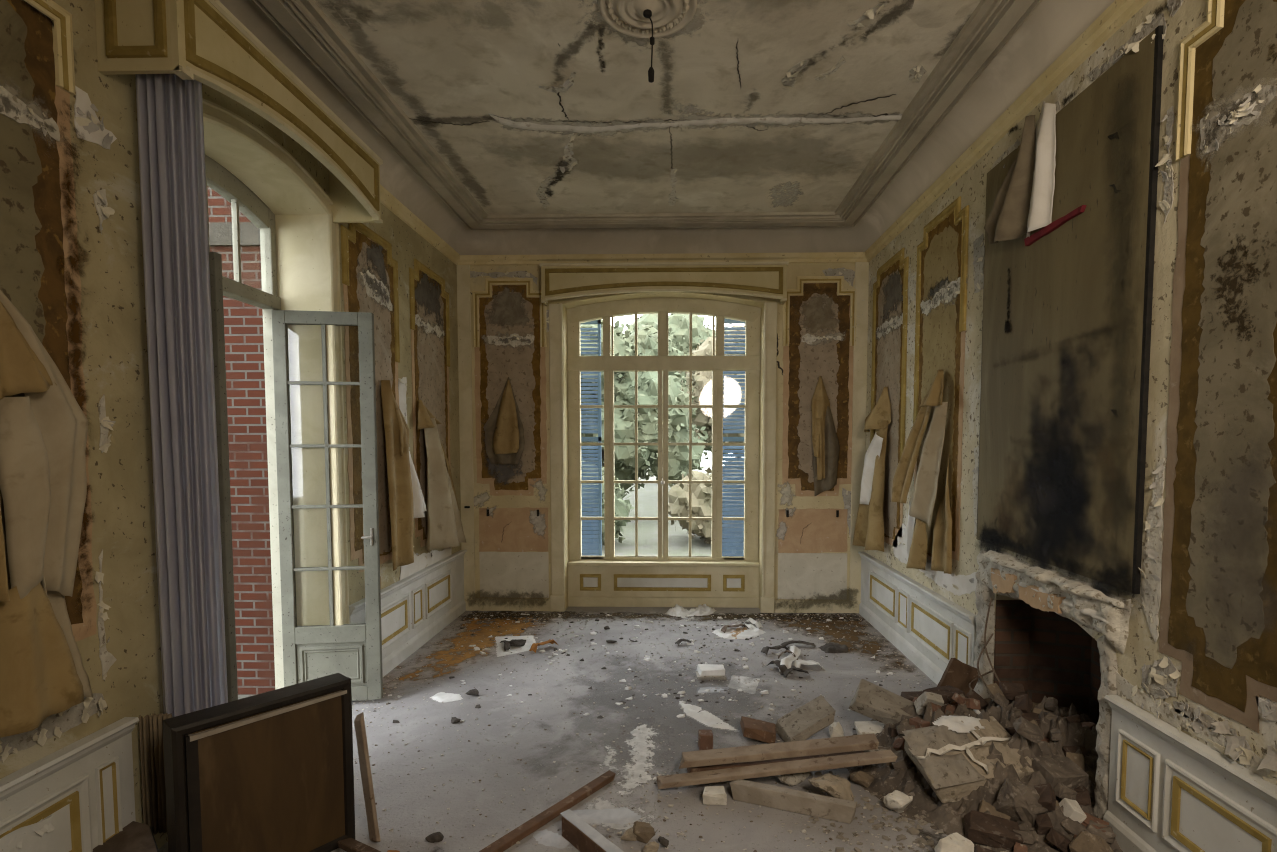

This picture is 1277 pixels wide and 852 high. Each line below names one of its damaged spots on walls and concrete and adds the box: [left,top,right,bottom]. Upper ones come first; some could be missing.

flaking render [0,84,60,142]
peeling [74,86,117,149]
crack [488,42,902,169]
flaking render [1199,78,1277,159]
flaking render [536,133,578,210]
mould [1211,236,1274,341]
flaking render [482,310,549,350]
flaking render [801,332,845,345]
peeling [1138,458,1166,642]
peeling [0,549,117,763]
peeling [1116,656,1277,785]
peeling [0,815,55,852]